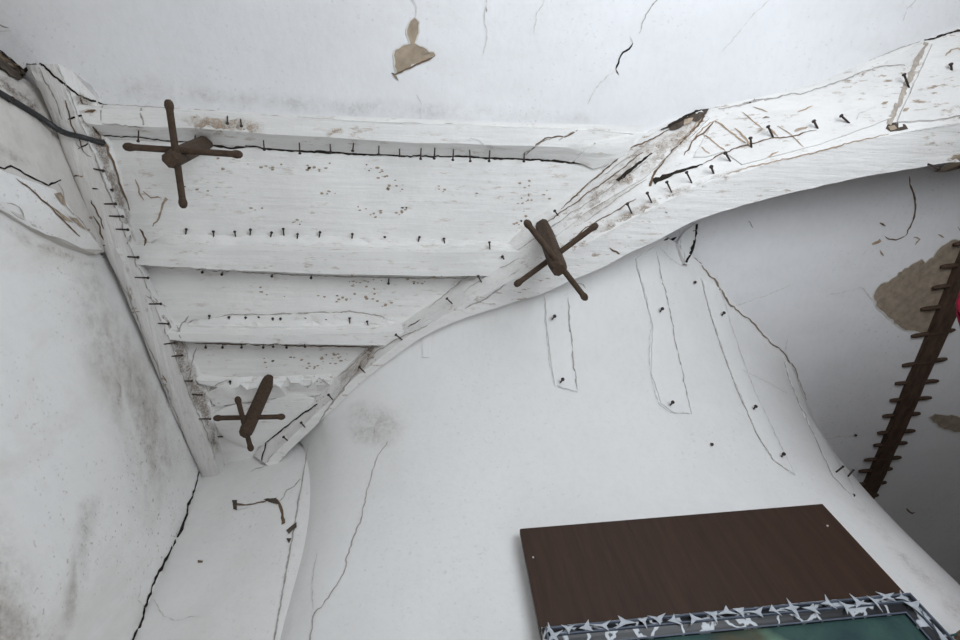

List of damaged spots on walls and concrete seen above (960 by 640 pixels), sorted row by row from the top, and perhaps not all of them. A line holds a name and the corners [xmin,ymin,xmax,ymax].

spalling [0,50,26,80]
flaking render [392,17,436,81]
crack [481,0,489,56]
crack [588,0,657,103]
crack [213,29,960,241]
spalling [935,153,960,172]
crack [865,176,960,256]
flaking render [873,239,960,333]
crack [0,63,535,640]
crack [610,222,859,496]